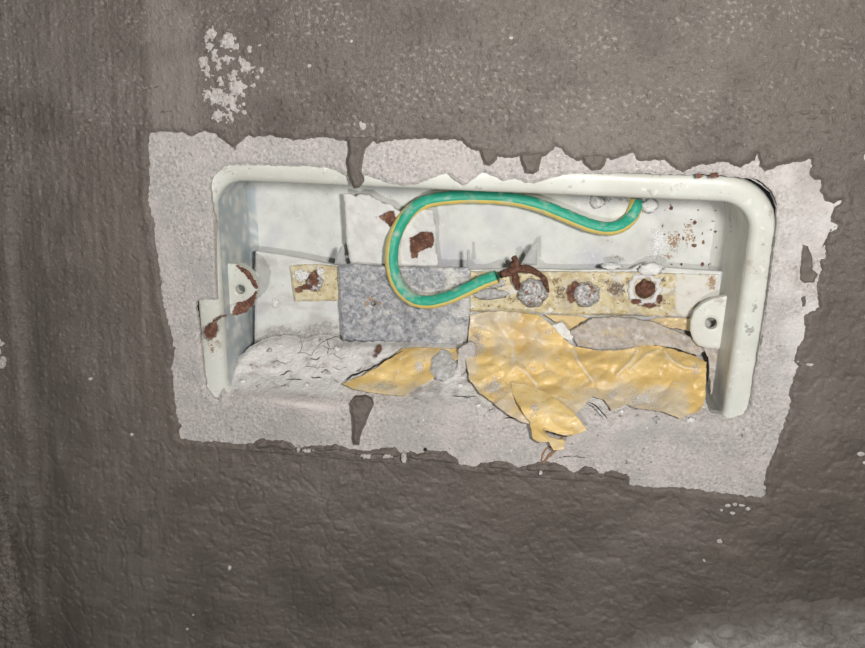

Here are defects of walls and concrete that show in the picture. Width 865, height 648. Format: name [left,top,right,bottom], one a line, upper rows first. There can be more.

peeling [198,25,264,124]
corrosion [379,211,396,227]
corrosion [410,231,434,258]
corrosion [295,270,319,293]
corrosion [554,278,579,303]
corrosion [203,265,258,353]
peeling [148,131,841,515]